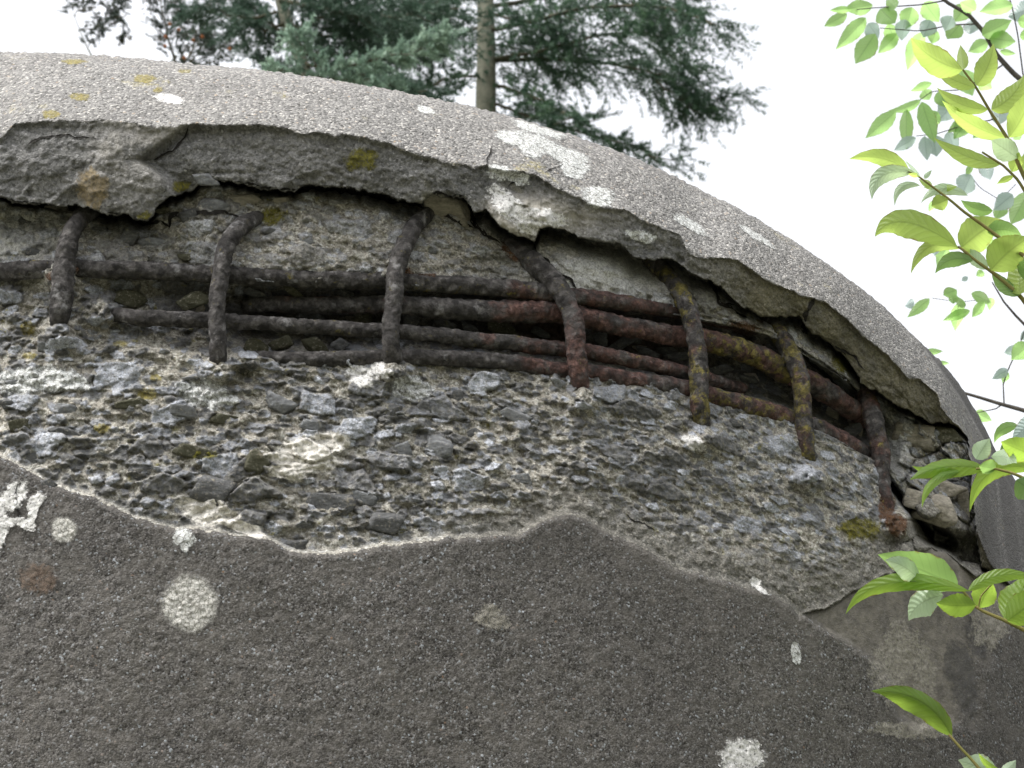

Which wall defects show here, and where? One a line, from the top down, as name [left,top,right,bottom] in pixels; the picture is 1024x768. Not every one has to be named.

crack [25,134,96,146]
crack [154,126,189,160]
crack [3,198,239,229]
crack [218,181,500,243]
crack [532,242,576,288]
crack [707,278,747,318]
rust [728,321,760,339]
crack [801,298,864,392]
spalling [0,119,994,616]
efflorescence [0,481,47,548]
rust [878,497,910,538]